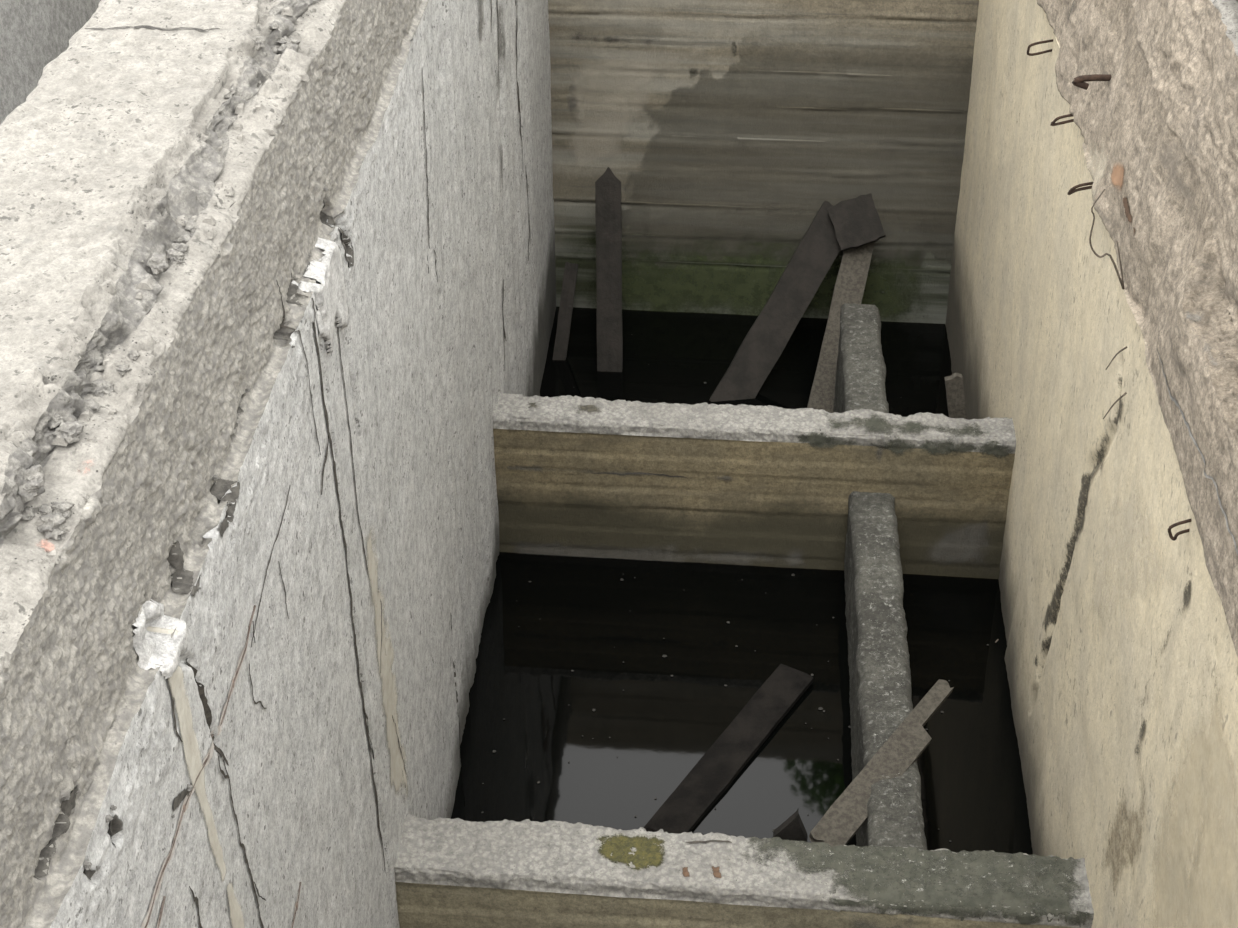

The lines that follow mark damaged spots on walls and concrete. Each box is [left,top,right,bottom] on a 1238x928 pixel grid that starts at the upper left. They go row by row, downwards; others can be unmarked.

spalling [0,0,320,548]
peeling [286,187,354,355]
rust [1111,165,1135,233]
spalling [167,541,201,597]
crack [249,487,290,709]
crack [277,273,406,867]
peeling [132,599,245,928]